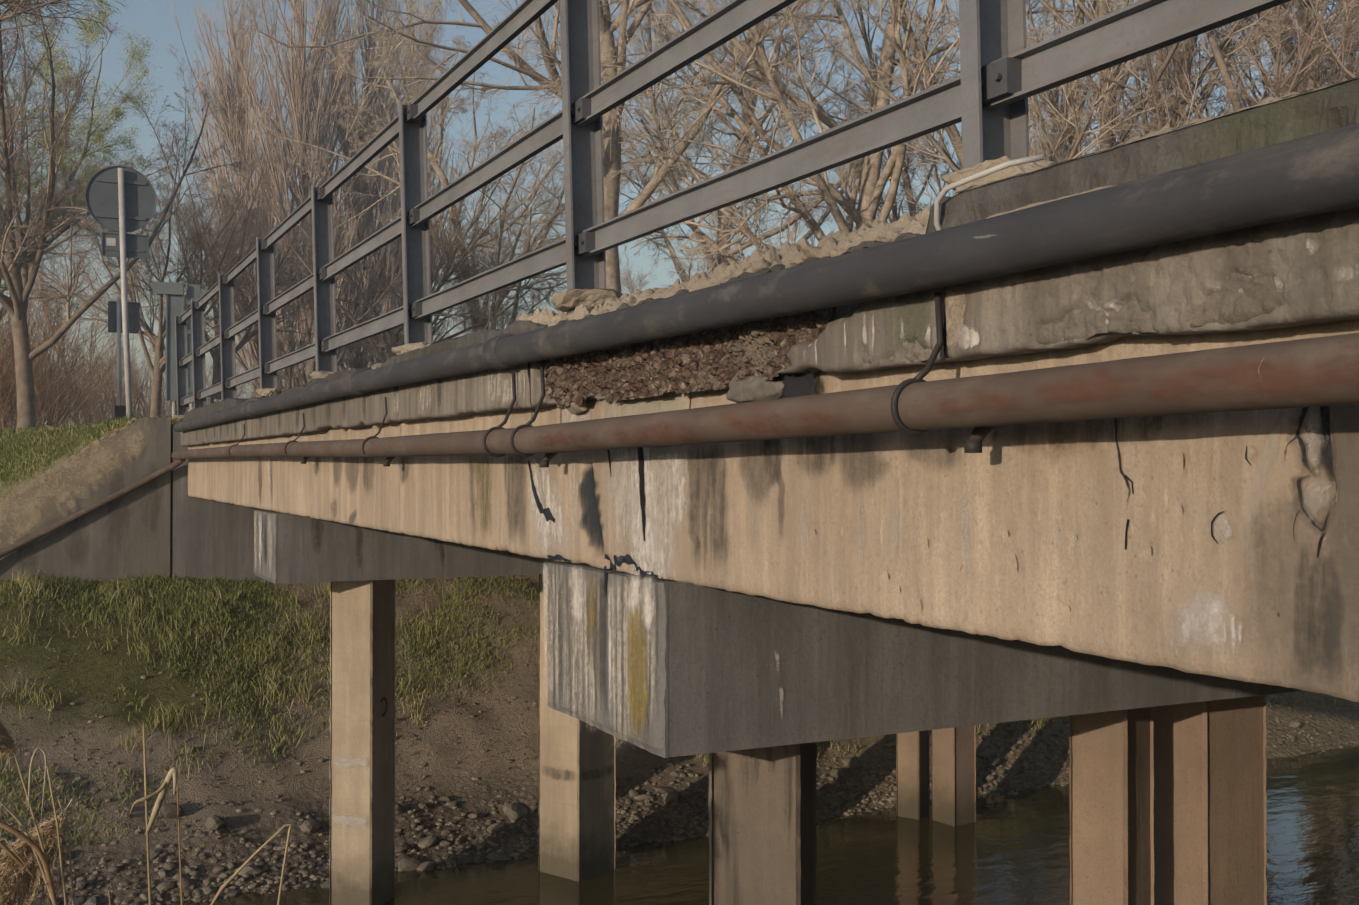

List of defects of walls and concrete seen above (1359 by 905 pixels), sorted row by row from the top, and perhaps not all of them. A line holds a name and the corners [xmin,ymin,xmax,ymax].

spalling [536,307,833,414]
crack [528,458,571,562]
leakage [505,447,724,724]
crack [604,447,658,596]
crack [1114,418,1134,550]
crack [1285,406,1337,558]
leakage [1321,420,1359,679]